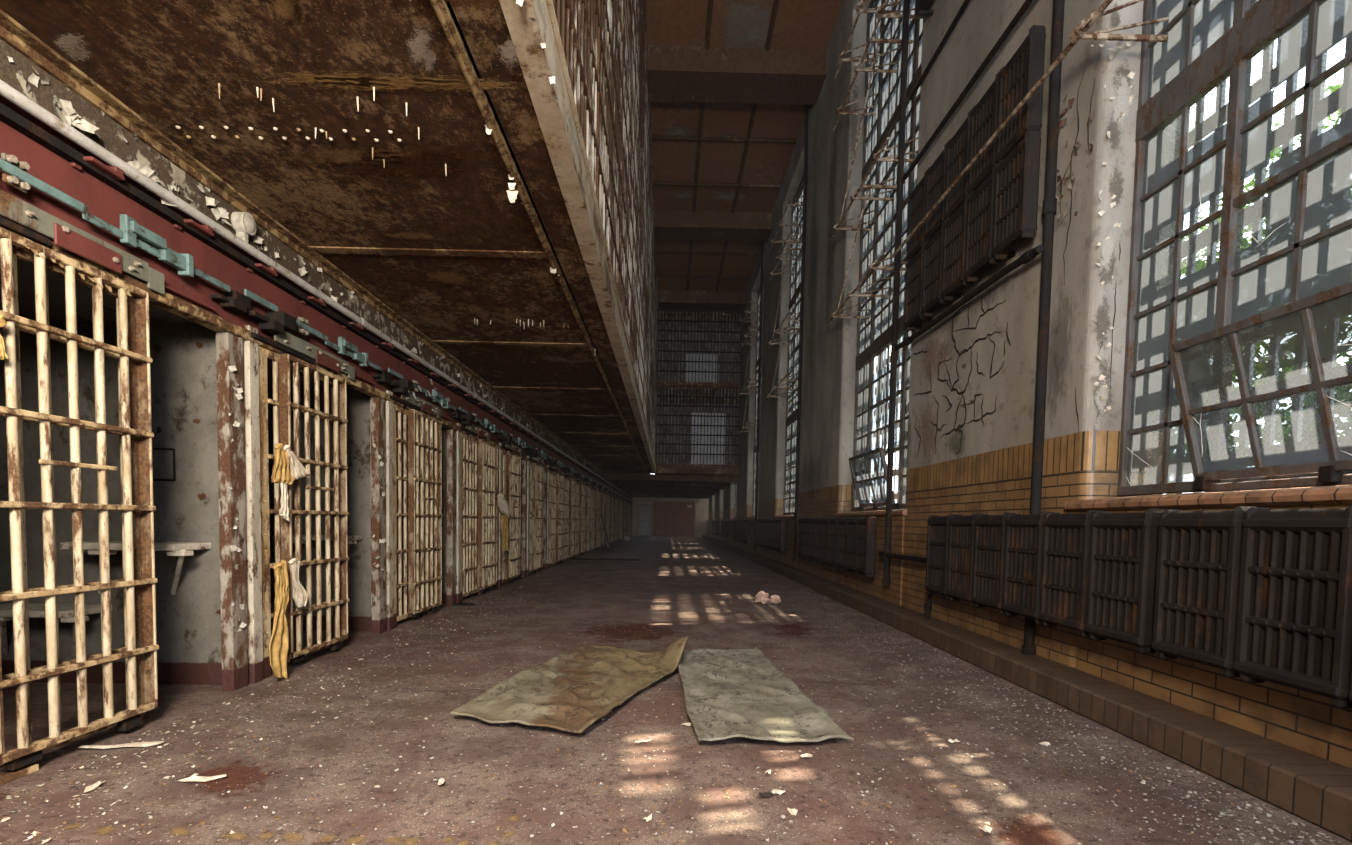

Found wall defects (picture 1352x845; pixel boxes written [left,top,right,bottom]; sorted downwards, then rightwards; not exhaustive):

spalling [1111,1,1121,27]
peeling [26,66,104,140]
peeling [1056,41,1135,423]
crack [905,296,1011,454]